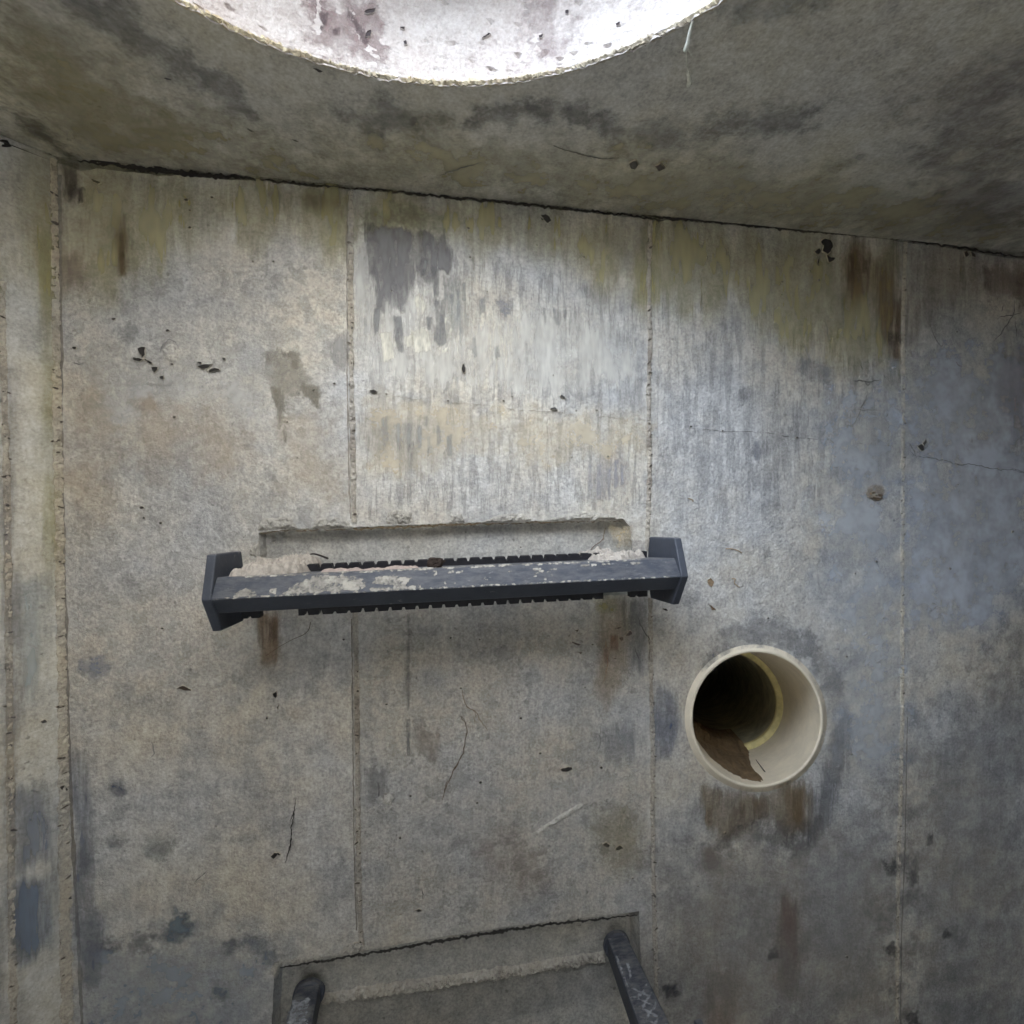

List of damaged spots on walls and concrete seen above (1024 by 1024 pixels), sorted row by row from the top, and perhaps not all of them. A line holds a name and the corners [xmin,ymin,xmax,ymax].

damp [364,224,451,352]
crack [78,160,1024,341]
damp [266,352,321,423]
crack [442,690,488,800]
crack [285,799,297,862]
rust [776,784,809,835]
damp [13,879,48,958]